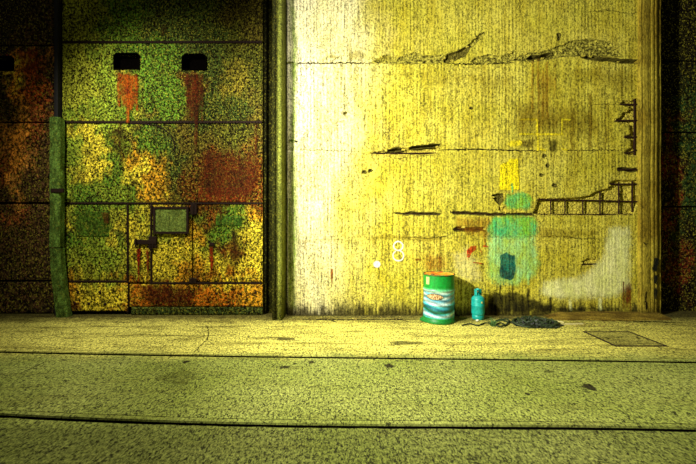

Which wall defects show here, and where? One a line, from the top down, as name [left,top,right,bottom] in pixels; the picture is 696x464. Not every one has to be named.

spalling [371,32,638,65]
rust [117,73,138,123]
spalling [366,143,441,155]
spalling [613,98,638,157]
spalling [450,167,638,216]